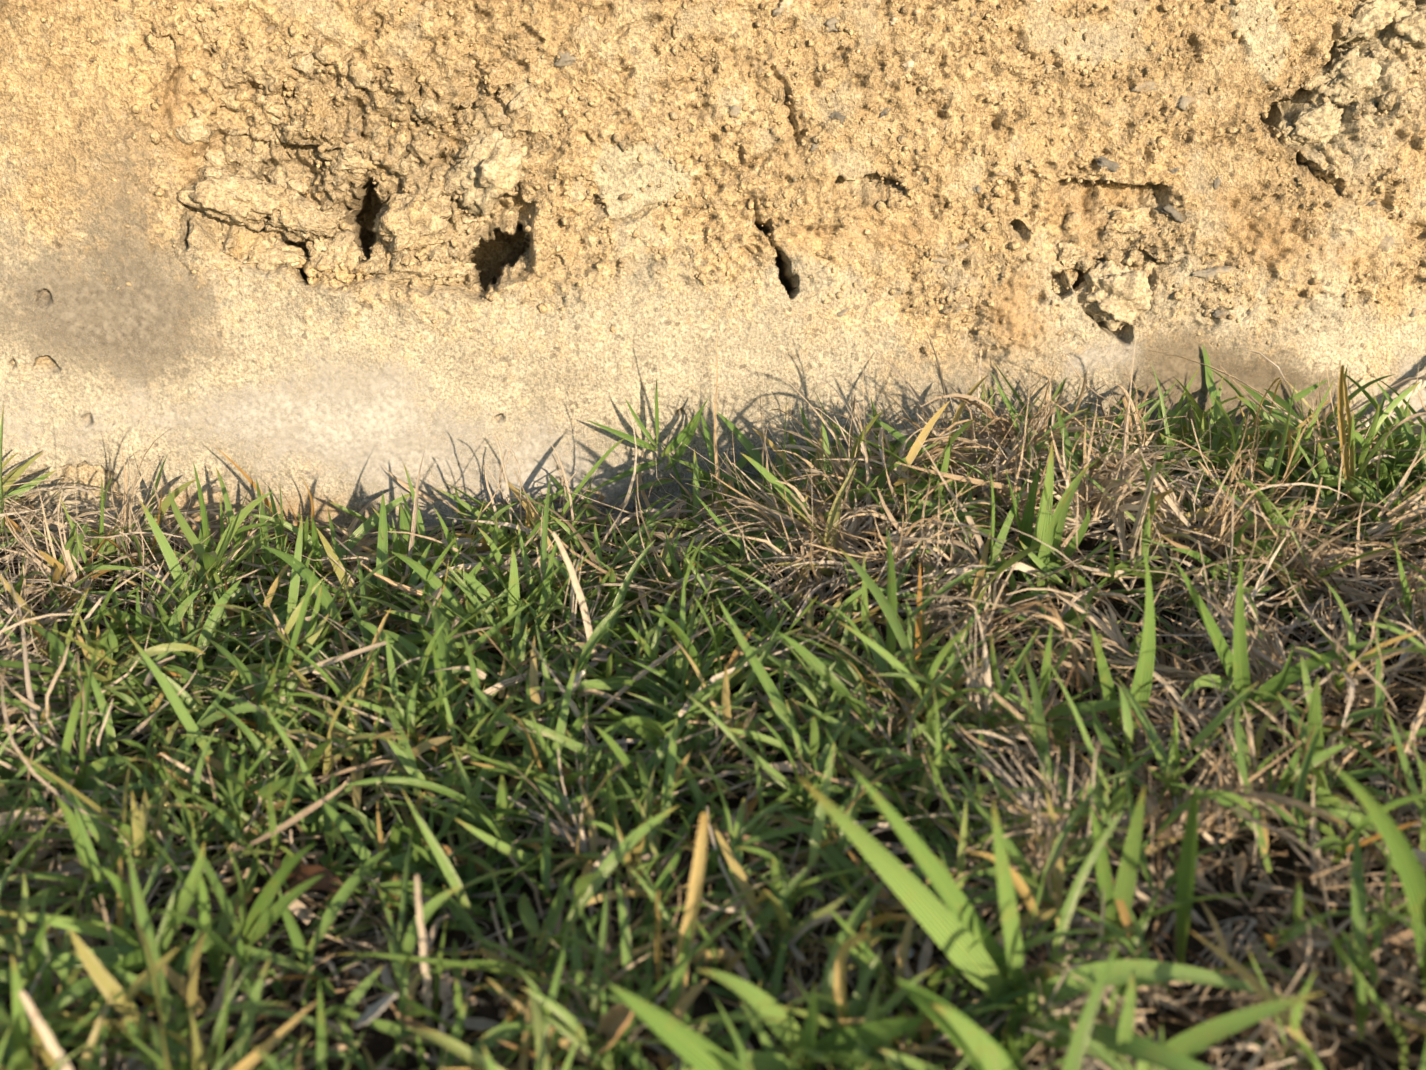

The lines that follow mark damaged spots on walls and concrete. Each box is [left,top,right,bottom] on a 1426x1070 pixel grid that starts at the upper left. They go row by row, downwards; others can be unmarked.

spalling [153,4,567,304]
crack [709,64,803,254]
spalling [1226,0,1426,199]
water stain [0,261,193,374]
water stain [124,364,756,517]